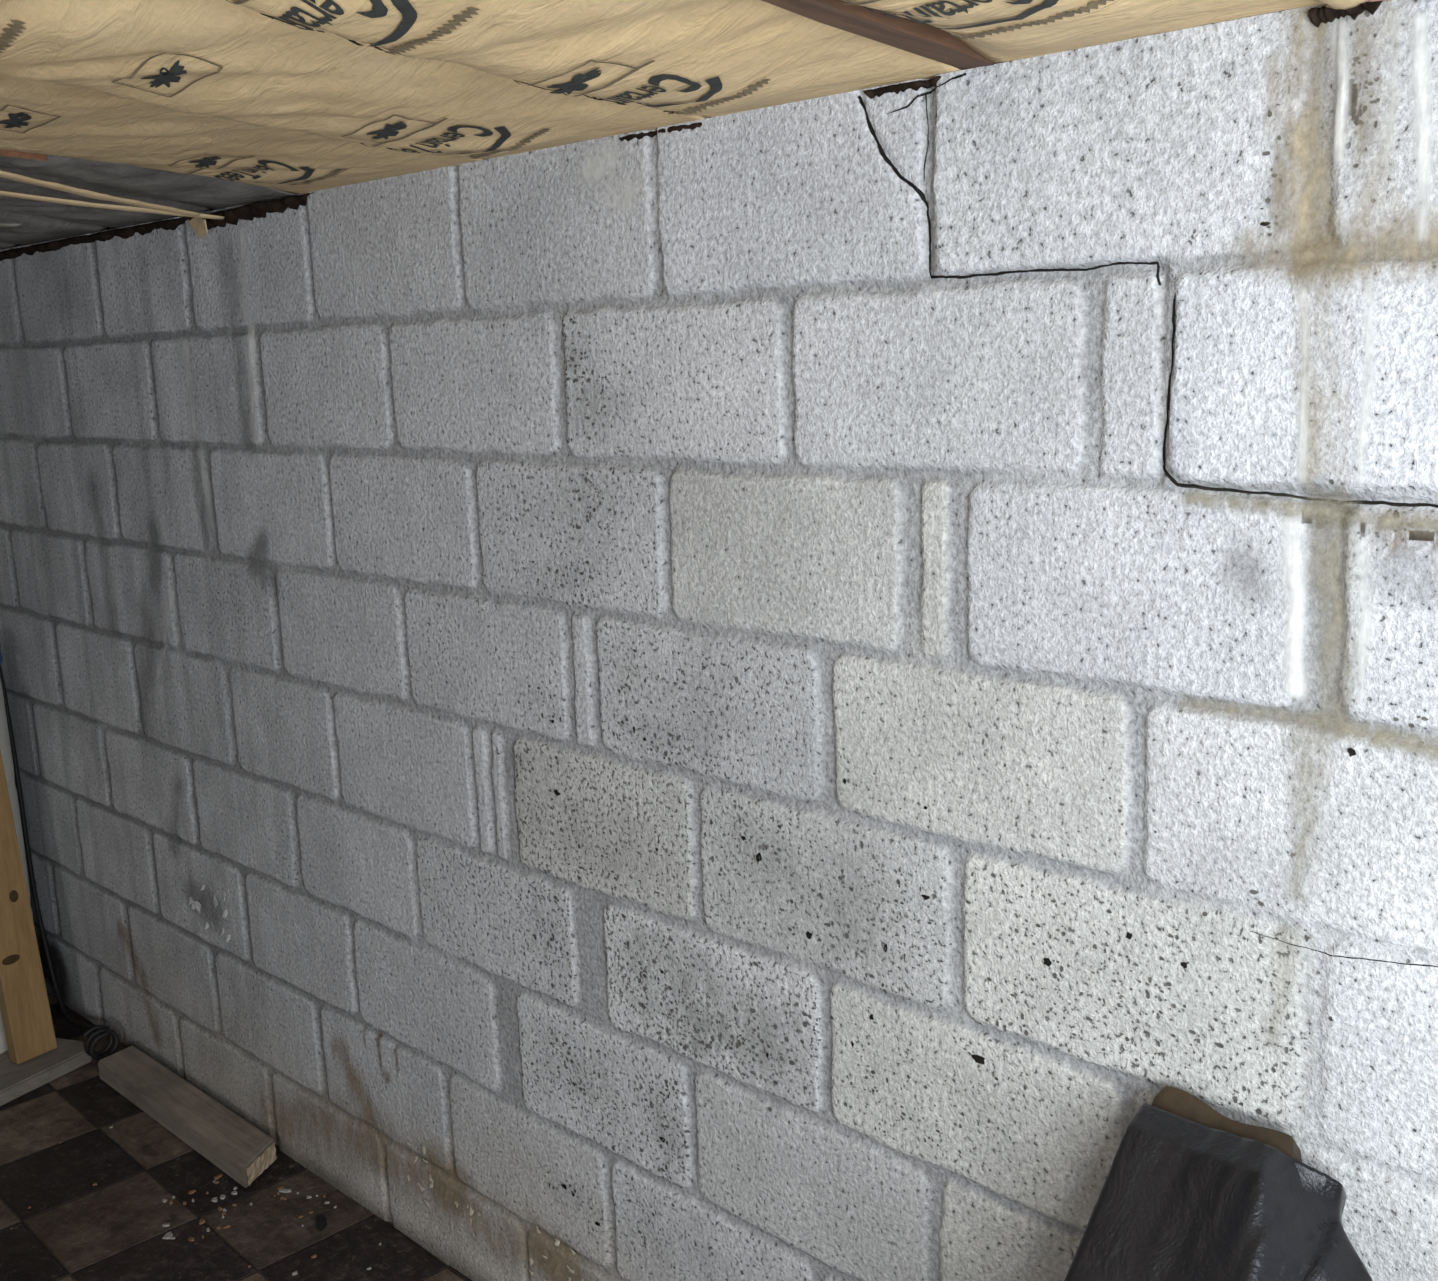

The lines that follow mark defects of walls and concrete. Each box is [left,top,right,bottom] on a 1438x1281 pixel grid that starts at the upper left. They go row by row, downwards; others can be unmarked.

crack [858,73,1438,508]
damp [1272,5,1438,482]